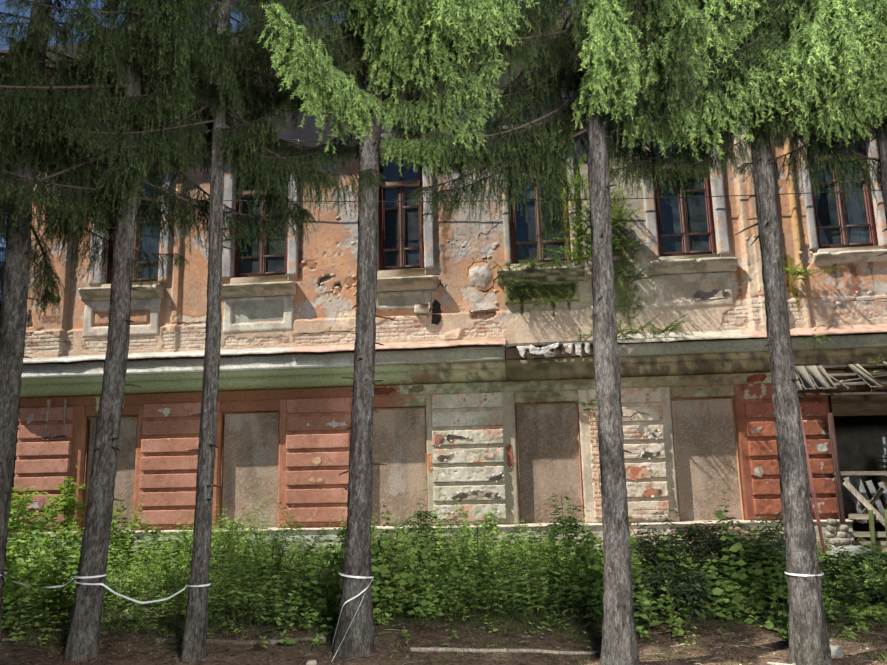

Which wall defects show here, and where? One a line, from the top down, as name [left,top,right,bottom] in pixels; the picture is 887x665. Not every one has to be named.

peeling [330,188,358,251]
flaking render [301,260,357,296]
flaking render [24,311,107,355]
flaking render [129,315,206,350]
flaking render [376,316,476,340]
flaking render [460,286,499,312]
spalling [519,343,594,359]
flaking render [787,297,806,323]
flaking render [832,289,887,322]
peeling [427,434,473,472]
peeling [445,443,514,522]
flaking render [623,428,669,519]